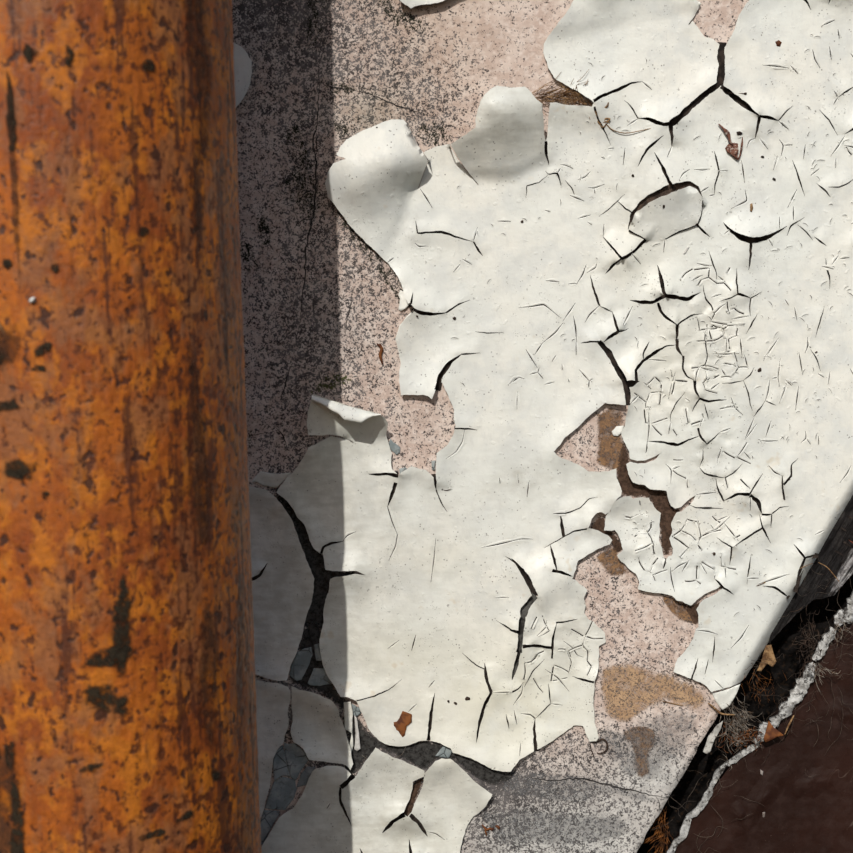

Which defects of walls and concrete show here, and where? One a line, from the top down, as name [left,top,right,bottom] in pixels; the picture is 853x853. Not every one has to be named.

leakage [379,0,429,33]
peeling [233,43,252,108]
leakage [320,81,355,95]
leakage [419,121,452,147]
leakage [277,122,403,304]
leakage [240,216,271,273]
peeling [249,0,853,853]
crack [369,471,400,561]
crack [466,497,603,756]
crack [427,680,435,740]
crack [326,772,355,824]
crack [382,813,445,853]